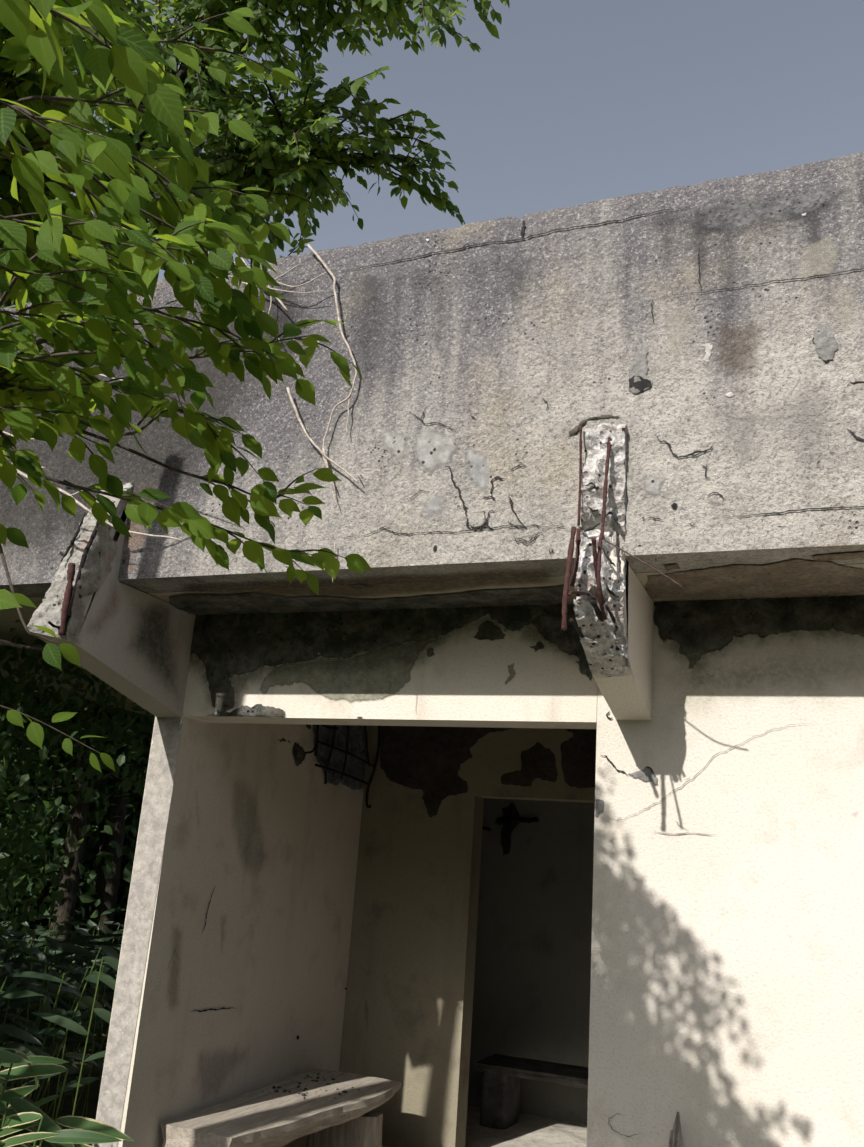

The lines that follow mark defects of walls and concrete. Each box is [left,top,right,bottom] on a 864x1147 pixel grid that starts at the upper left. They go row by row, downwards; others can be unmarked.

spalling [628,347,652,394]
crack [410,410,476,430]
crack [348,464,565,554]
crack [656,431,864,518]
spalling [27,483,133,644]
peeling [169,414,864,717]
peeling [277,716,513,817]
peeling [501,729,604,817]
peeling [629,766,658,786]
crack [601,723,810,835]
crack [191,1005,233,1013]